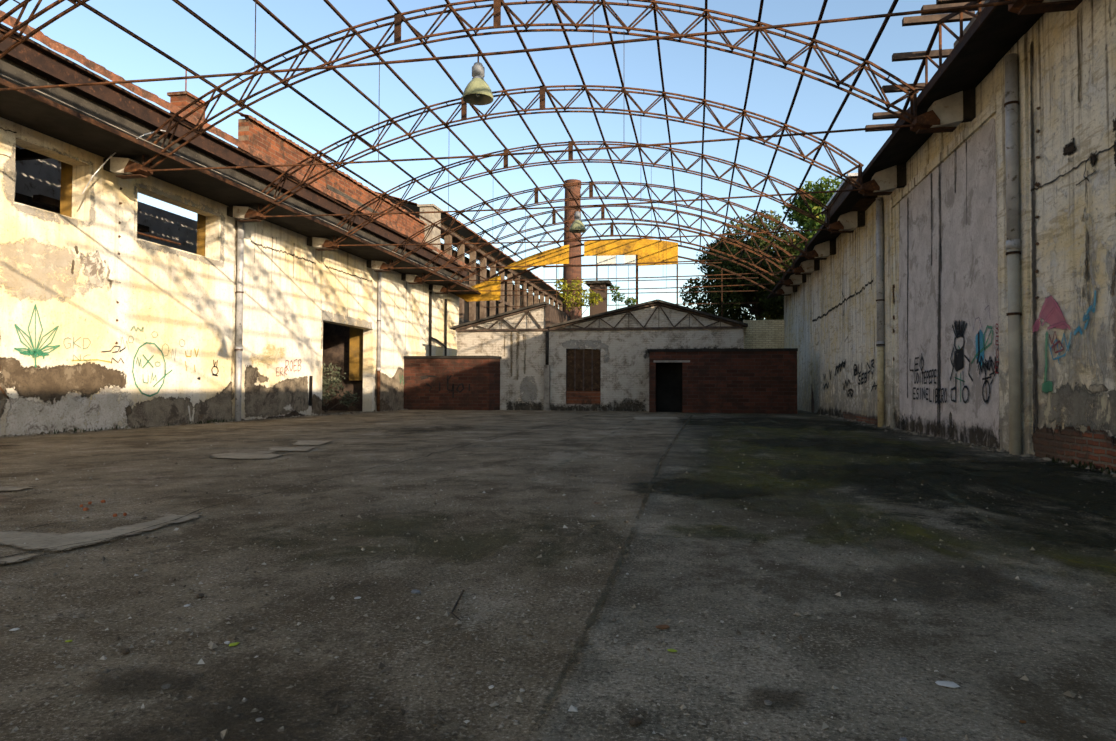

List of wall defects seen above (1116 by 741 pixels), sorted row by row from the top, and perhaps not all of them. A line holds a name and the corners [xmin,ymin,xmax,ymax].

spalling [1063,137,1076,160]
crack [1030,145,1114,191]
peeling [0,238,121,302]
leakage [676,42,1116,550]
peeling [0,364,322,436]
flaking render [1032,424,1116,472]
crack [0,414,593,564]
leakage [628,478,788,499]